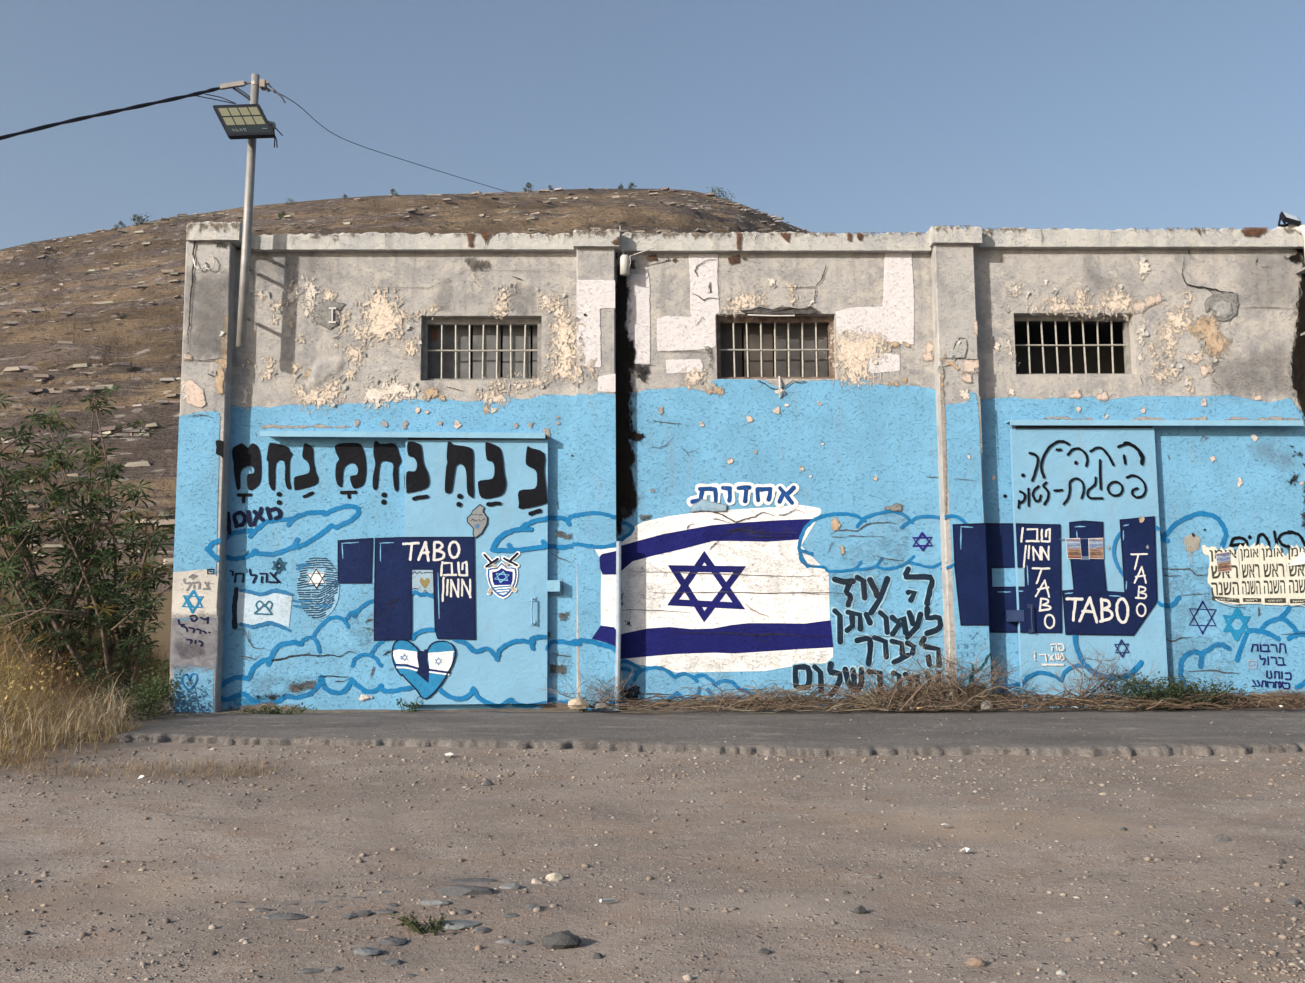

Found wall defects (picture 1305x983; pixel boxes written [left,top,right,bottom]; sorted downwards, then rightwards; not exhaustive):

peeling [180,274,462,429]
flaking render [462,255,491,282]
peeling [471,280,598,415]
peeling [514,415,560,439]
peeling [825,321,982,517]
peeling [1000,256,1239,420]
crack [1182,249,1279,326]
flaking render [1225,416,1299,441]